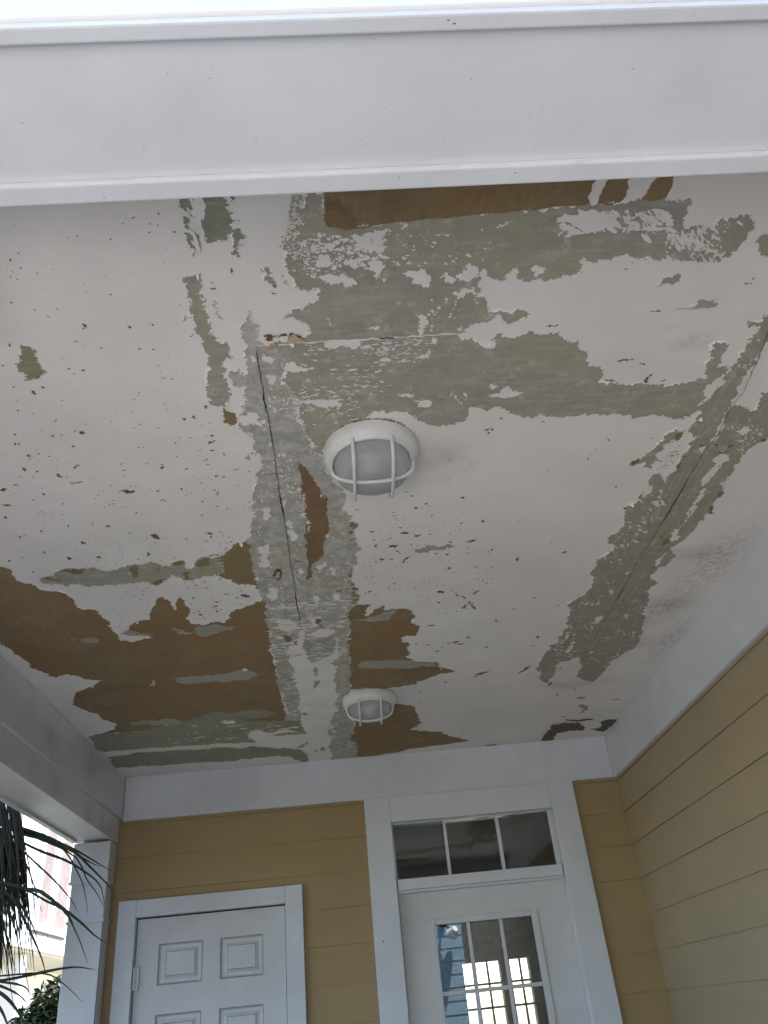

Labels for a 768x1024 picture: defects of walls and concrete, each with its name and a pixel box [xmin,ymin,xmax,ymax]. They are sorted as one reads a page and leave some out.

peeling [1,343,48,418]
peeling [0,434,95,518]
crack [256,346,301,625]
peeling [173,193,768,762]
crack [581,333,768,661]